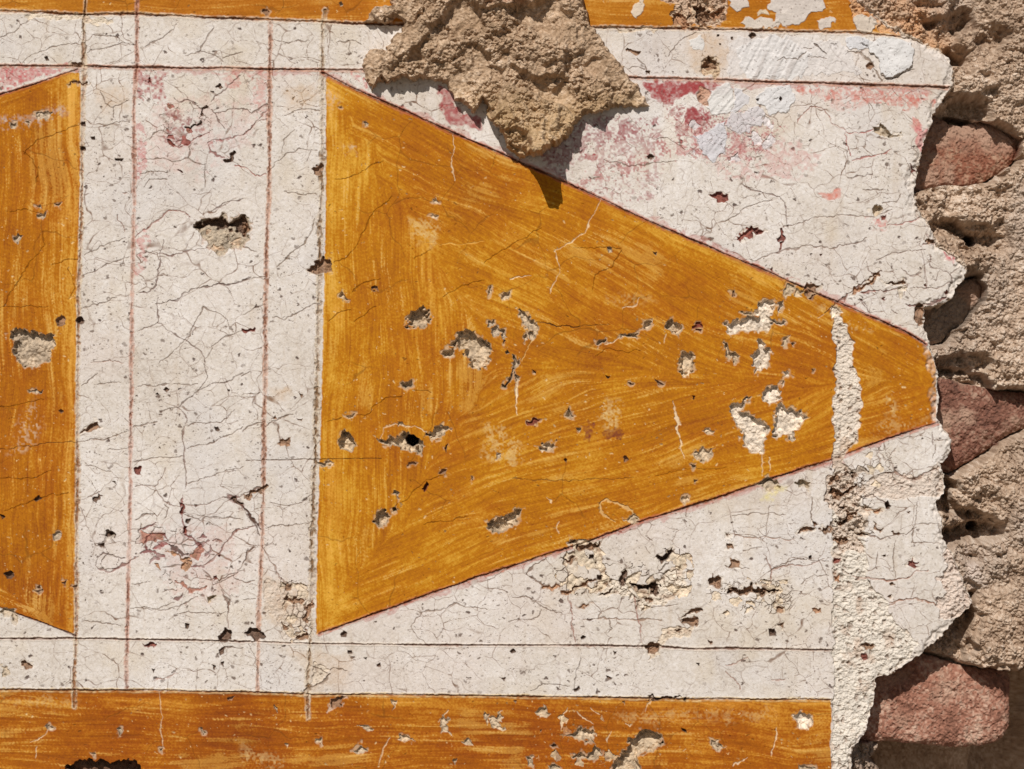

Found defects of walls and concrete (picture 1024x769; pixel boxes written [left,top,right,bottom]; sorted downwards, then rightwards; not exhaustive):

crack [778,43,915,82]
spalling [193,213,252,257]
crack [725,106,960,319]
crack [0,27,431,676]
crack [514,297,640,415]
spalling [729,370,808,455]
spalling [723,282,875,376]
crack [412,401,727,743]
flaking render [541,538,694,611]
spalling [641,533,794,660]
flaking render [797,394,944,583]
crack [853,432,947,606]